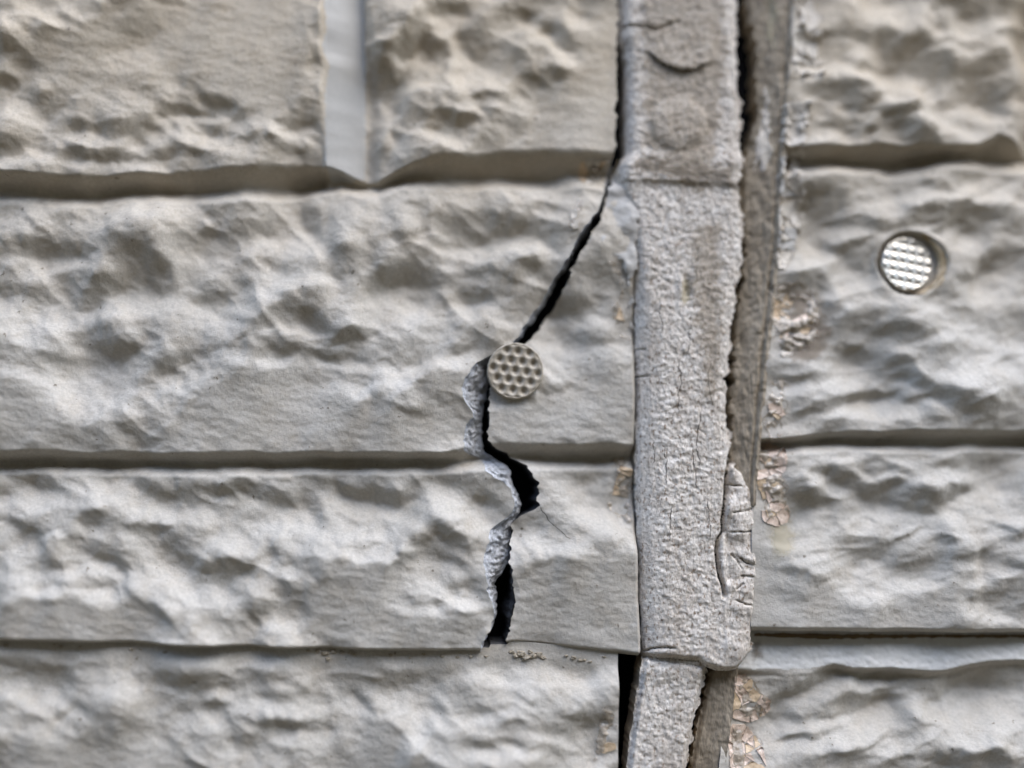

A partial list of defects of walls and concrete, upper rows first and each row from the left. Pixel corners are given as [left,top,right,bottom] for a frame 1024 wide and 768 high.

crack [513,23,710,344]
crack [735,0,752,153]
peeling [772,100,820,357]
crack [462,355,569,649]
peeling [757,379,790,526]
peeling [727,674,772,768]